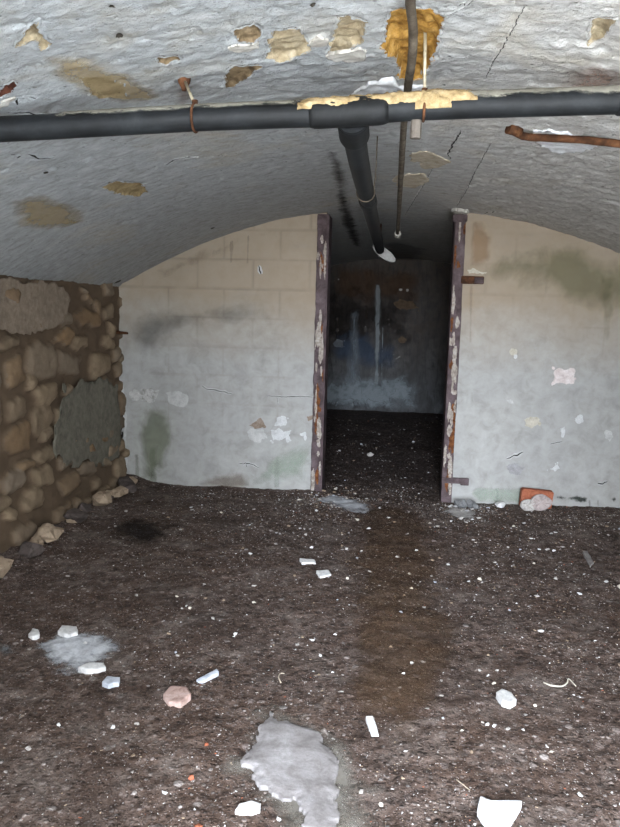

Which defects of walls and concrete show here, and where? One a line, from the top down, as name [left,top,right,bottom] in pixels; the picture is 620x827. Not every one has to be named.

spalling [13,17,54,52]
water stain [62,61,151,100]
spalling [221,5,449,95]
peeling [247,385,322,491]
corrosion [314,370,324,435]
water stain [327,285,414,408]
corrosion [448,404,456,454]
peeling [551,366,576,386]